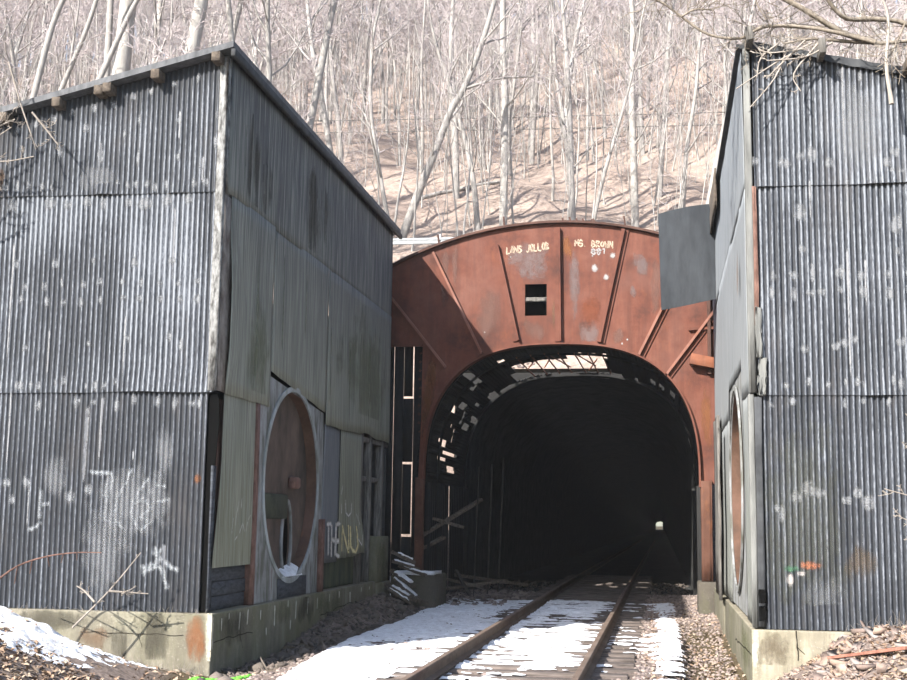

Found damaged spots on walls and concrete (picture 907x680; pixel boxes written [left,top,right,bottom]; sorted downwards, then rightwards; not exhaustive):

corrosion [188,620,204,655]